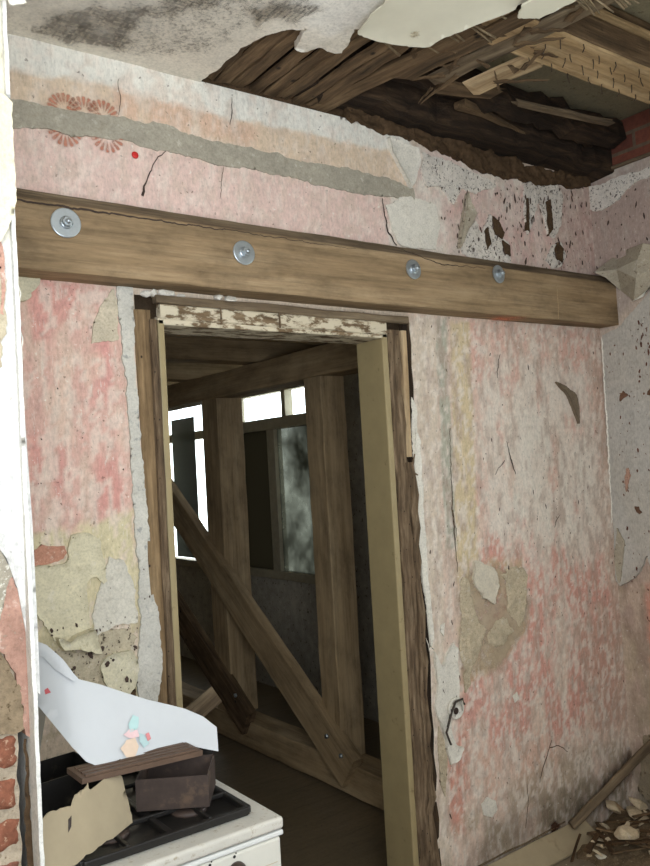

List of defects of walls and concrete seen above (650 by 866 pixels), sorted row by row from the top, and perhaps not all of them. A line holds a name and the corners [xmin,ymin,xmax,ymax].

mould [31,0,321,54]
crack [17,151,356,249]
flaking render [1,0,650,269]
flaking render [0,210,139,866]
flaking render [411,397,528,765]